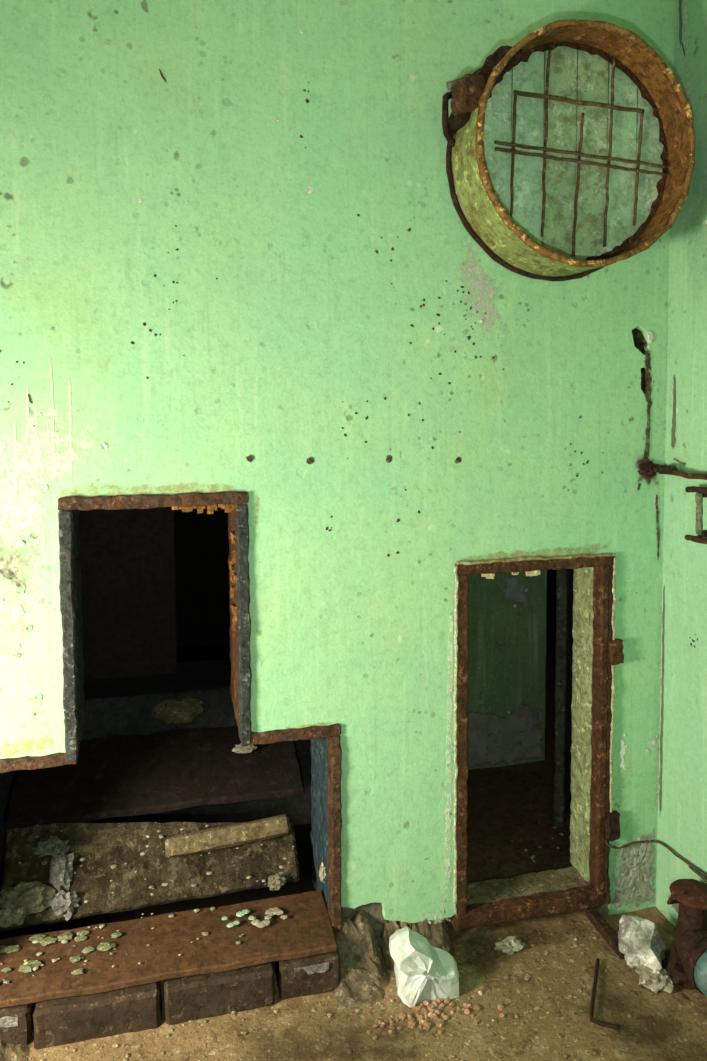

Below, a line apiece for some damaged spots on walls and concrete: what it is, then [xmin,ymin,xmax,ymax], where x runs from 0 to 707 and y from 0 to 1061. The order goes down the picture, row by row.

peeling [0,408,108,594]
corrosion [637,457,658,484]